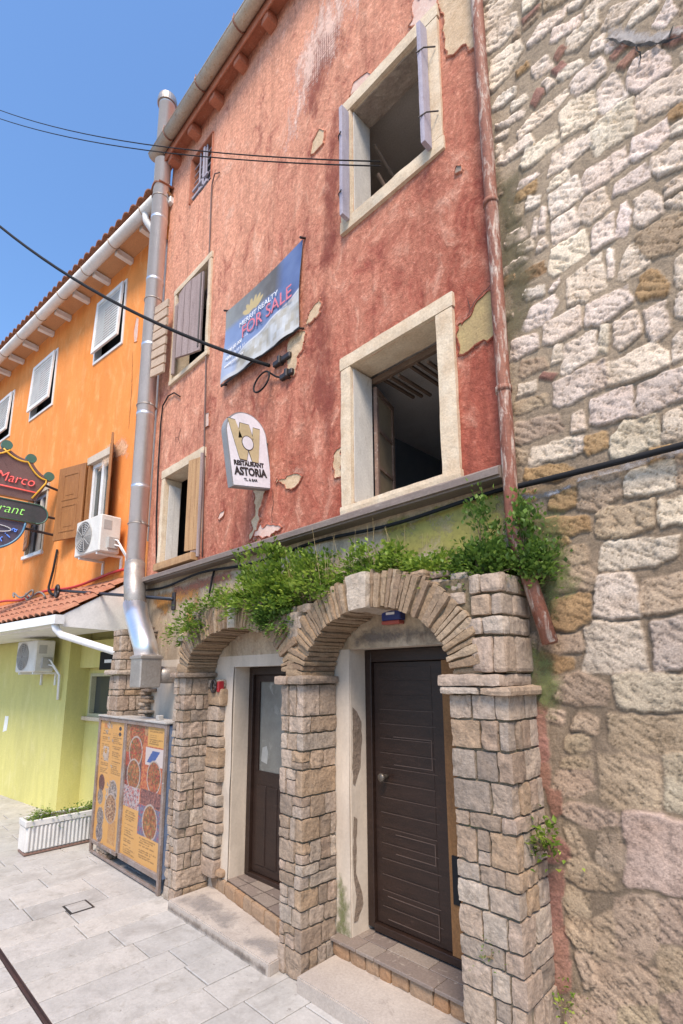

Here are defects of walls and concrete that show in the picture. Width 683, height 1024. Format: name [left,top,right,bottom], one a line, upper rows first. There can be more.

leakage [289,0,359,134]
flaking render [408,0,474,60]
flaking render [310,128,326,156]
leakage [321,140,338,265]
flaking render [286,297,323,377]
flaking render [456,290,493,357]
flaking render [248,470,304,541]
flaking render [352,707,362,785]
flaking render [353,817,363,923]